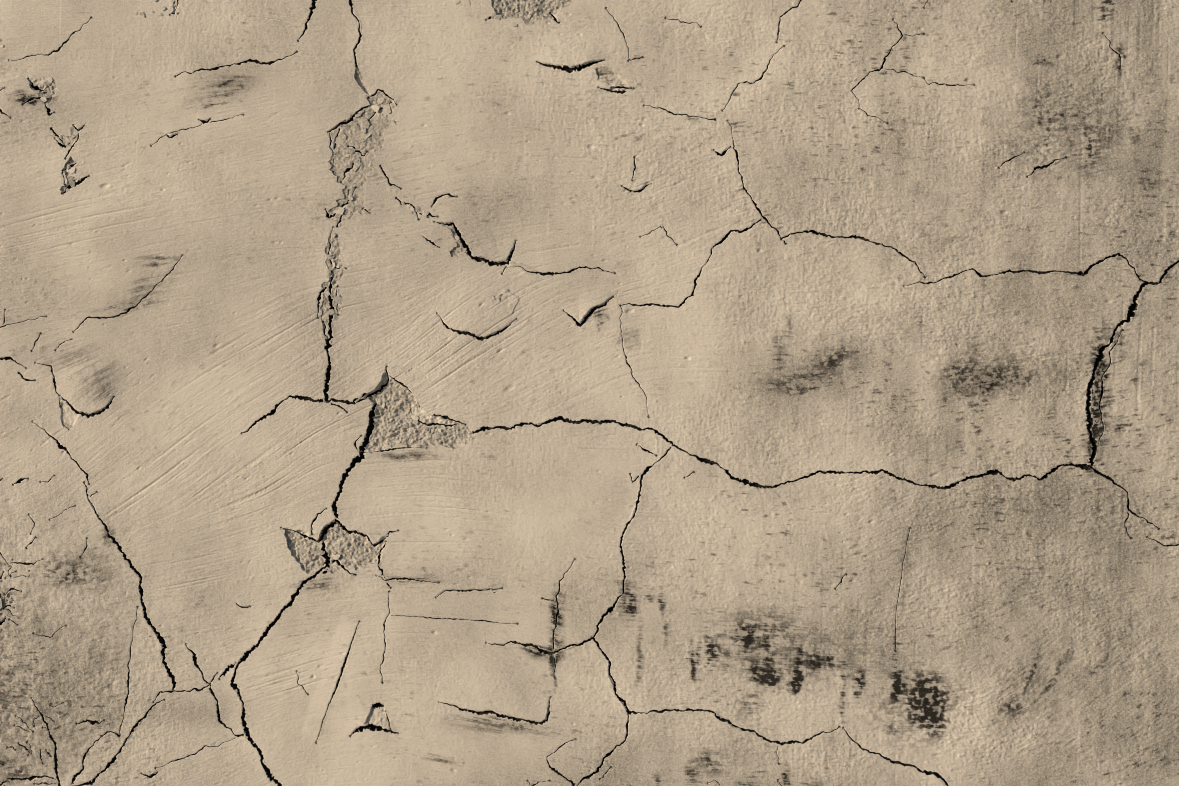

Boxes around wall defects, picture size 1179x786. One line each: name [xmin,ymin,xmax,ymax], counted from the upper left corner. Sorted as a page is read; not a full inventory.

crack [0,17,92,118]
crack [175,0,318,77]
crack [348,0,363,67]
spalling [486,0,574,26]
spalling [319,68,397,339]
crack [0,87,399,786]
spalling [336,358,473,455]
crack [474,0,1179,786]
flaking render [278,493,507,600]
leakage [691,636,720,681]
leakage [737,618,865,714]
leakage [891,670,948,735]